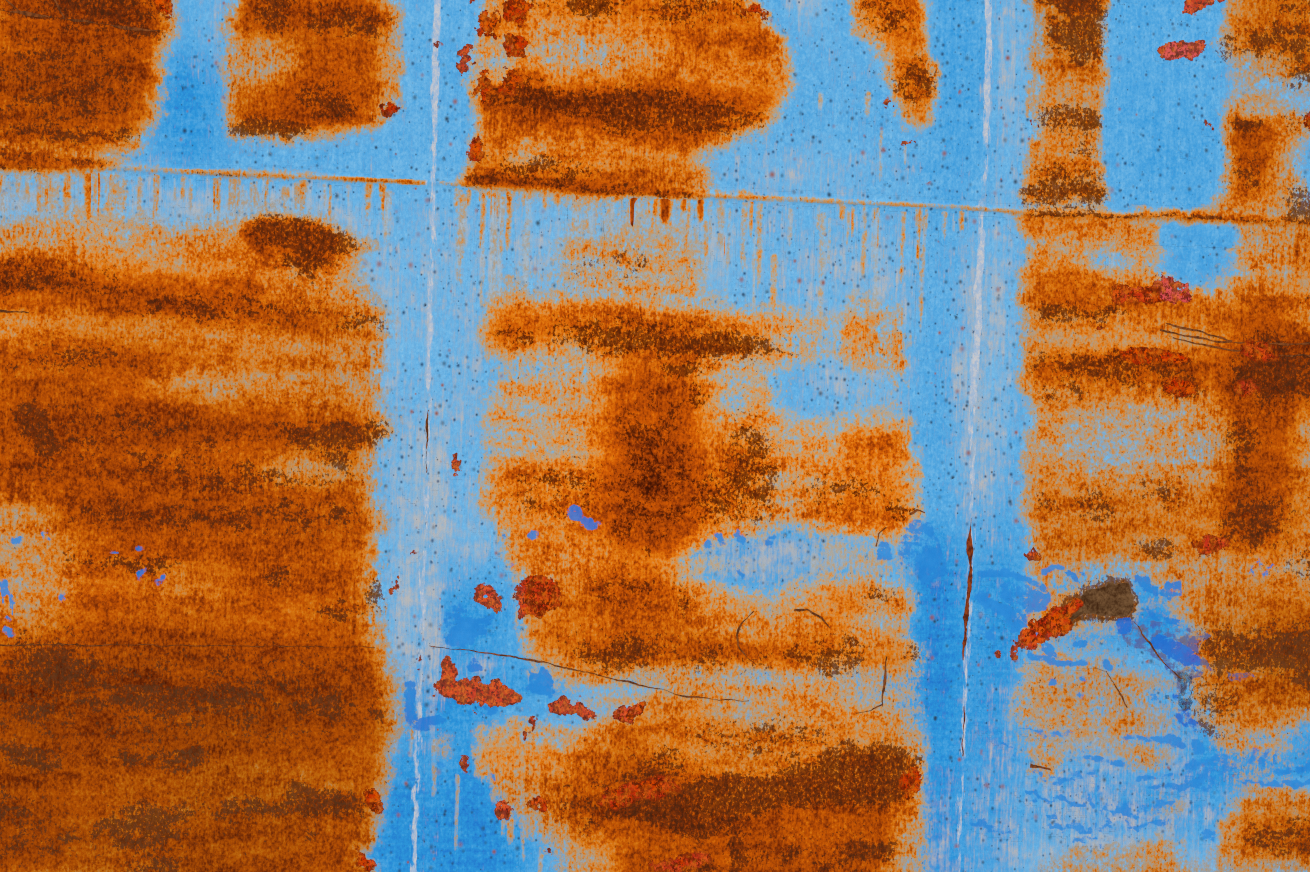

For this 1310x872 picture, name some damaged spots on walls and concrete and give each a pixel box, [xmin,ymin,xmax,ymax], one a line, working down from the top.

peeling [429,34,445,61]
peeling [1152,0,1226,67]
corrosion [0,0,946,872]
corrosion [445,0,1310,872]
peeling [470,571,567,623]
peeling [409,642,651,744]
peeling [491,789,552,825]
peeling [539,844,562,872]